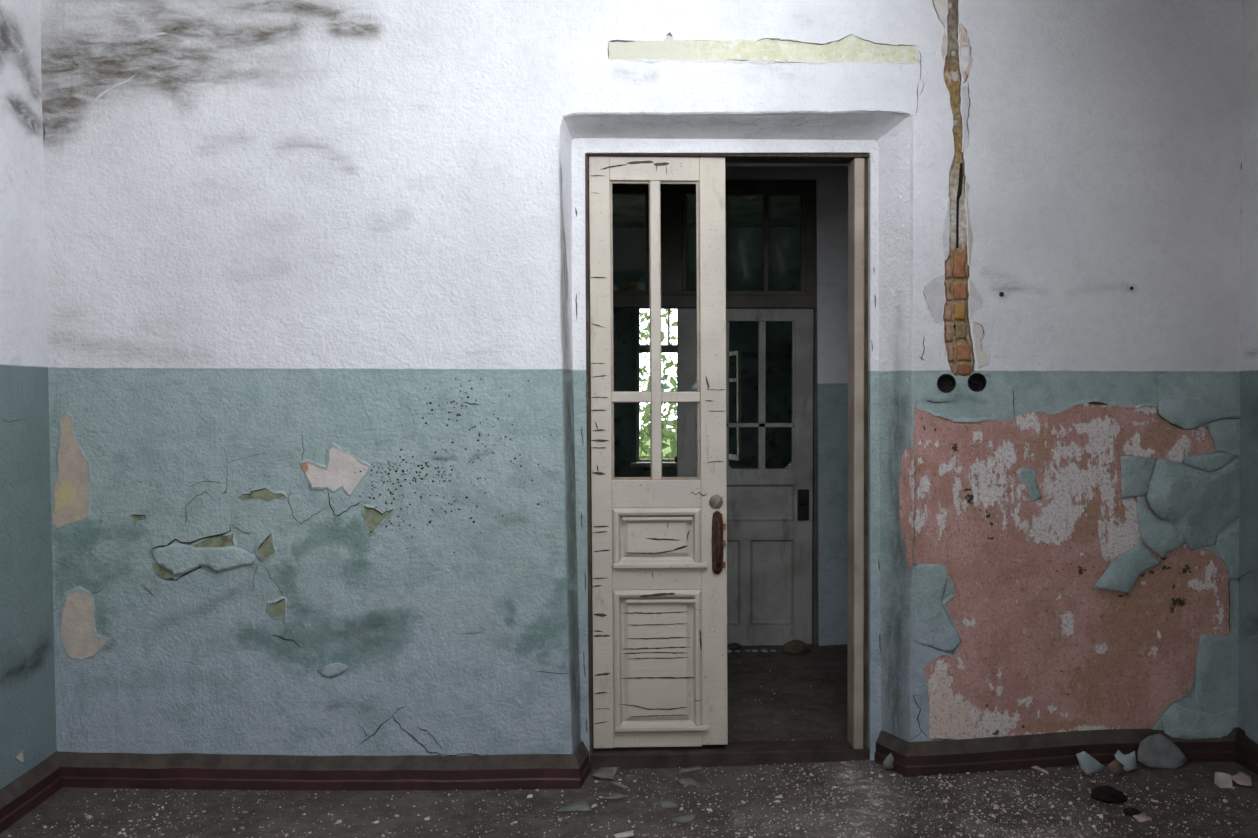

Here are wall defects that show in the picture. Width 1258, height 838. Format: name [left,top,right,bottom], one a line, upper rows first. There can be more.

peeling [607,32,919,65]
peeling [932,0,974,154]
peeling [921,196,950,325]
peeling [965,180,990,368]
peeling [51,411,92,529]
crack [185,445,266,527]
crack [288,489,360,524]
peeling [299,442,396,537]
peeling [59,586,112,661]
crack [248,564,300,647]
peeling [899,385,1241,741]
crack [356,706,478,756]